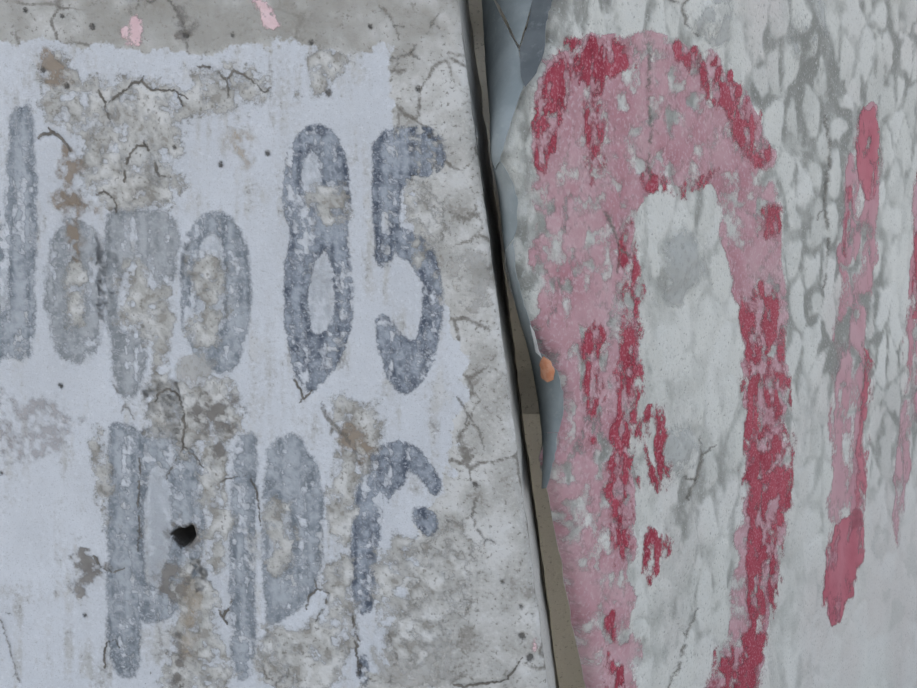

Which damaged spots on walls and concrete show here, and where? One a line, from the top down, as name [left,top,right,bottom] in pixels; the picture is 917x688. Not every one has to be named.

crack [37,127,71,152]
crack [95,141,171,213]
crack [98,76,188,120]
peeling [482,0,564,489]
peeling [112,255,245,688]
peeling [255,395,383,688]